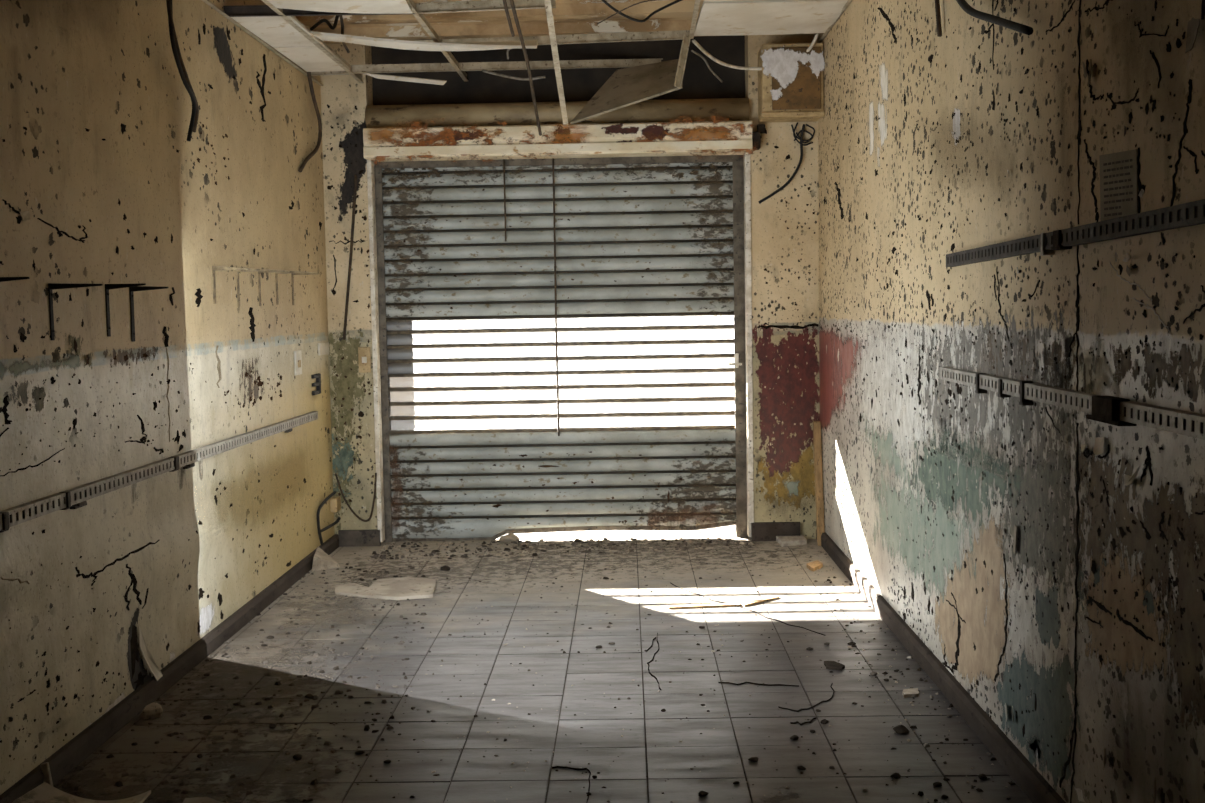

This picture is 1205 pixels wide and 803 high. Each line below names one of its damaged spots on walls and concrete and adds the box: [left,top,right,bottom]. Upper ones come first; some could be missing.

peeling [198,23,243,80]
spalling [365,73,447,85]
crack [1137,79,1205,213]
corrosion [369,115,756,330]
crack [1046,0,1113,391]
crack [1183,285,1205,340]
peeling [752,0,1205,803]
crack [75,540,159,586]
crack [1059,425,1205,803]
crack [646,633,661,690]
crack [552,766,597,803]